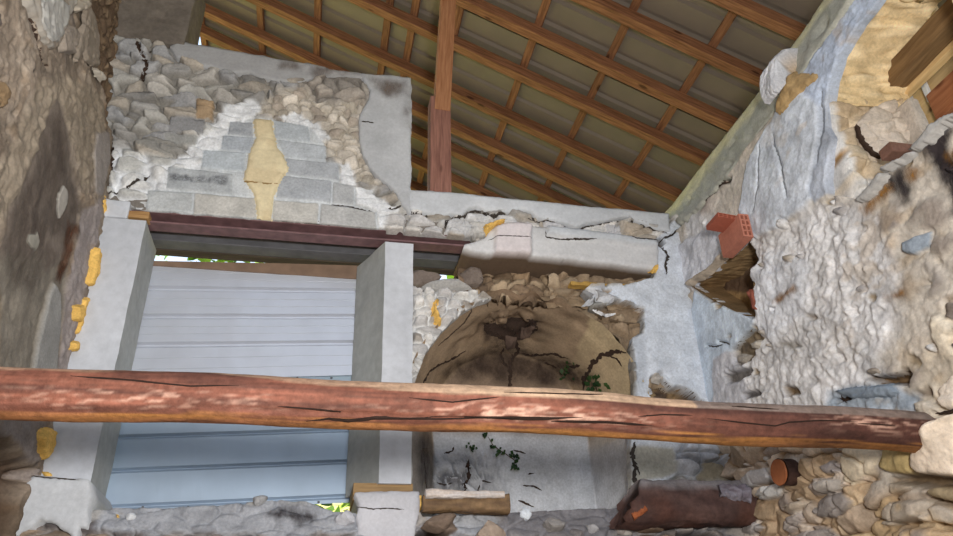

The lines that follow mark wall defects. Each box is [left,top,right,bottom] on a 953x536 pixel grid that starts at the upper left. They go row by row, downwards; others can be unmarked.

crack [28,18,48,66]
damp [889,169,909,200]
damp [923,129,953,196]
crack [332,204,677,274]
crack [423,309,472,383]
spalling [484,310,538,350]
damp [448,322,592,385]
crack [500,341,626,391]
spalling [581,286,644,325]